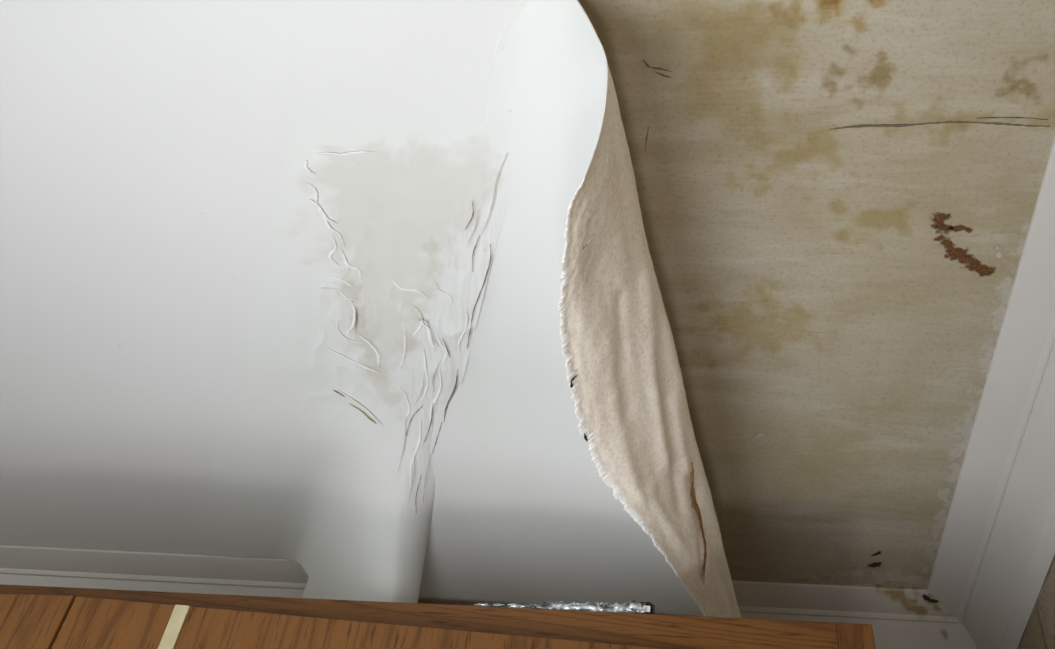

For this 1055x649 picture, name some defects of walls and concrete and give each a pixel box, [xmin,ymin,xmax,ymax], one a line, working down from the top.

crack [830,117,1050,130]
corrosion [931,214,995,277]